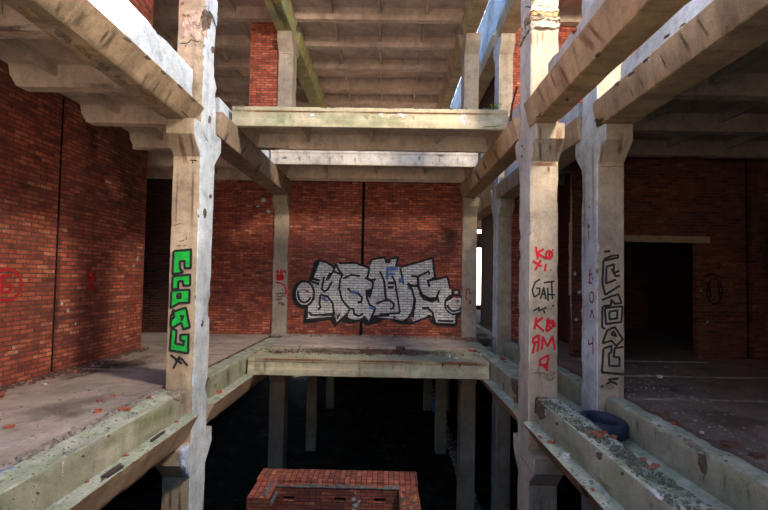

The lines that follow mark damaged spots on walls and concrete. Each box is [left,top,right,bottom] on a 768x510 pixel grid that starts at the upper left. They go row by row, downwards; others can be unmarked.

spalling [181,7,213,43]
spalling [535,397,547,420]
flaking render [179,442,189,478]